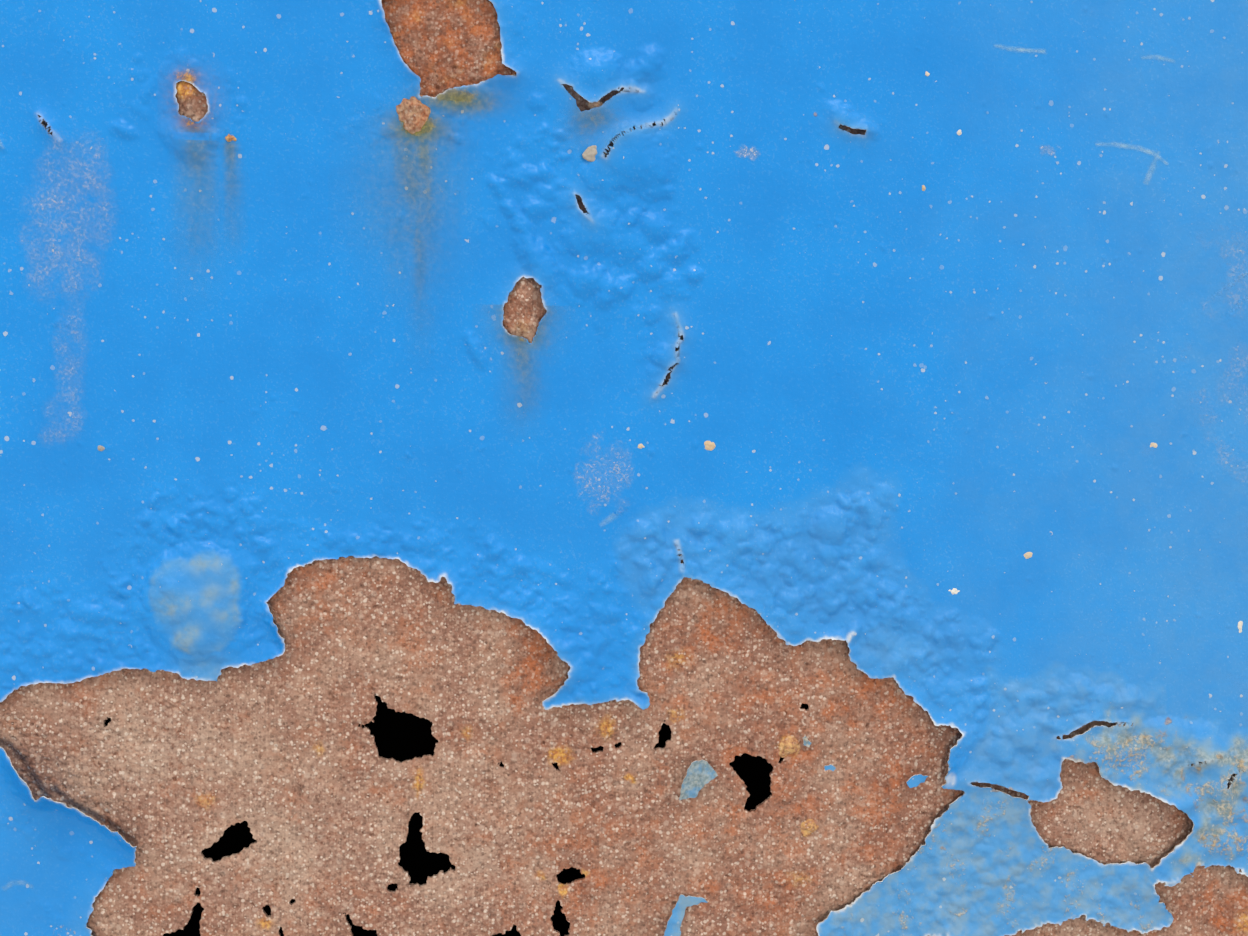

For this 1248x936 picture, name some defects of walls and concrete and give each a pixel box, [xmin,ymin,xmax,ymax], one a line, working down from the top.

peeling [167,69,219,133]
peeling [366,0,533,114]
crack [549,70,685,166]
crack [828,112,875,144]
crack [567,186,599,230]
peeling [491,265,559,357]
crack [644,305,689,404]
peeling [0,540,1248,936]